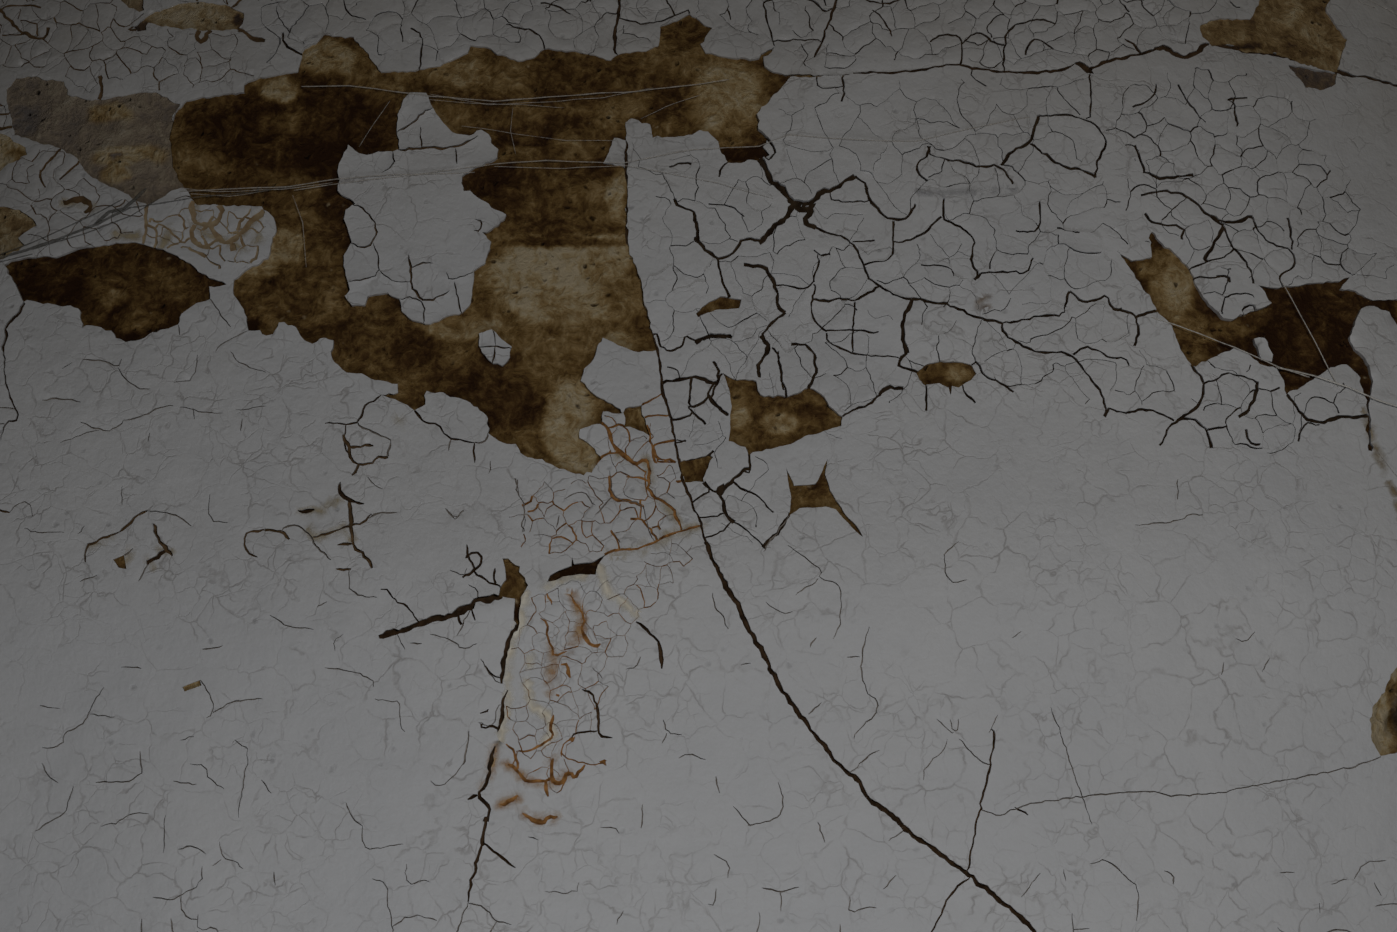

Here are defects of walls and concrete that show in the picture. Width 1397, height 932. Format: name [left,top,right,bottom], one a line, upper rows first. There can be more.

crack [0,0,364,100]
peeling [1200,0,1346,90]
crack [0,104,265,442]
crack [80,491,227,581]
crack [244,395,503,649]
peeling [0,15,821,475]
peeling [724,375,842,455]
peeling [787,461,862,536]
crack [367,0,1380,932]
peeling [1121,233,1397,451]
crack [36,667,242,932]
spalling [1370,668,1397,756]